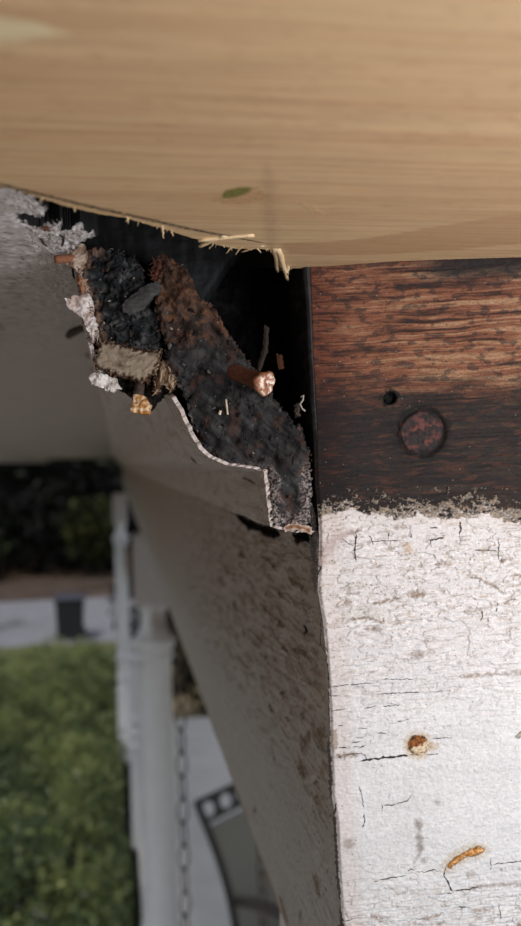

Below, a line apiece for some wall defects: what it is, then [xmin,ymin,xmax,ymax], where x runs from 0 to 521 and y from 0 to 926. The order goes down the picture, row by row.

peeling [65,266,101,344]
peeling [89,372,122,393]
crack [302,502,462,926]
rust [408,735,428,755]
rust [448,846,485,869]
crack [375,861,521,908]